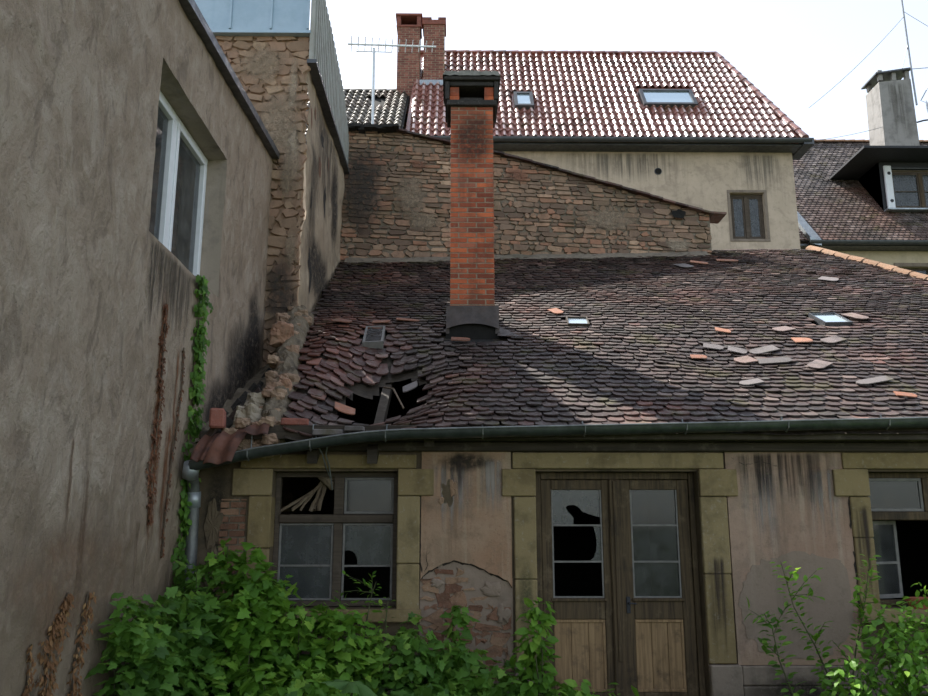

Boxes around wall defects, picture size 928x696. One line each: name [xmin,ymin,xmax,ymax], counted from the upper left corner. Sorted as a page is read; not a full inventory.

water stain [441,455,499,515]
water stain [755,454,831,522]
flaking render [419,560,514,685]
water stain [714,560,726,627]